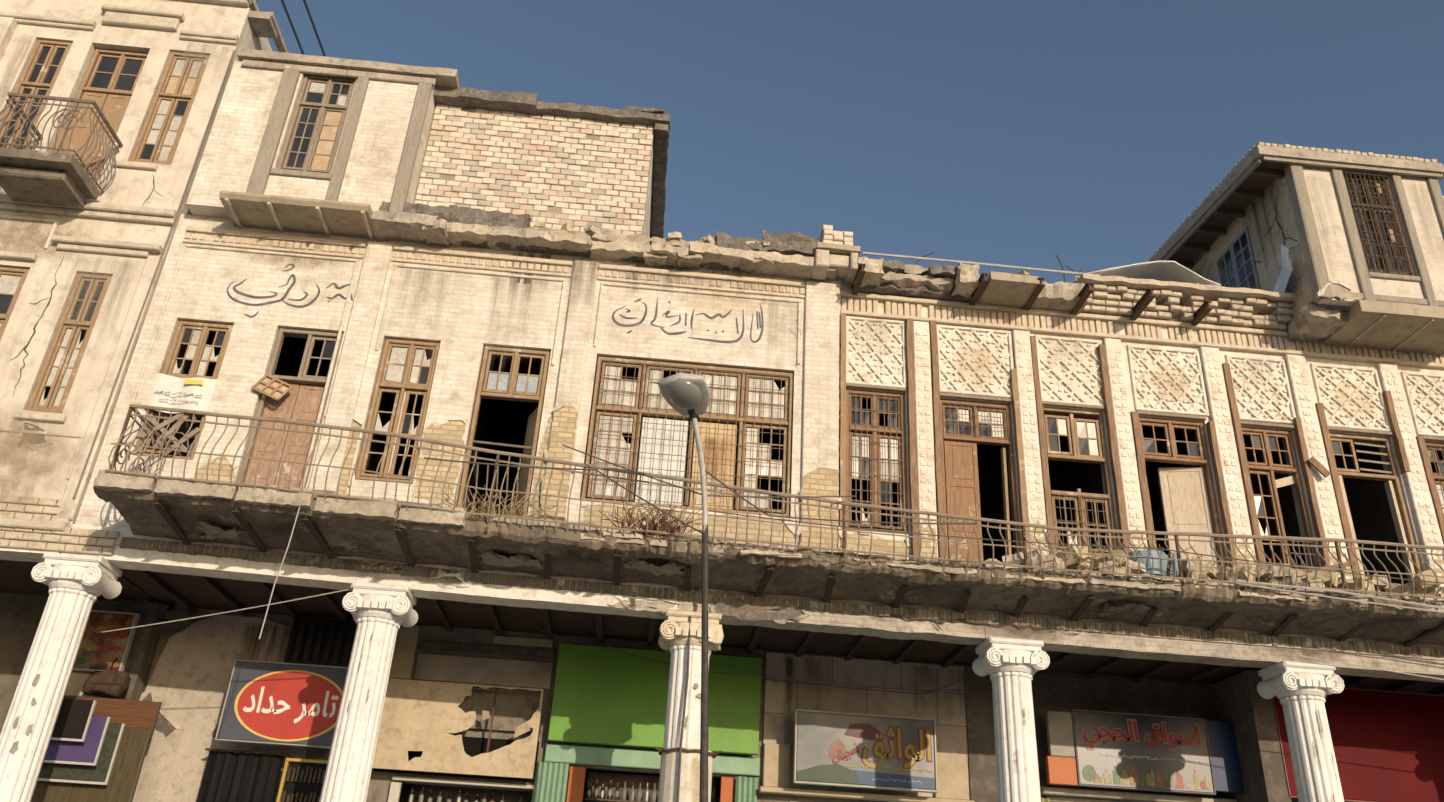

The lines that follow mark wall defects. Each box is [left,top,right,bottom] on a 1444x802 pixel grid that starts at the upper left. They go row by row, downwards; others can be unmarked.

crack [11,256,64,396]
spalling [197,522,248,540]
flaking render [411,418,469,507]
spalling [491,402,1444,617]